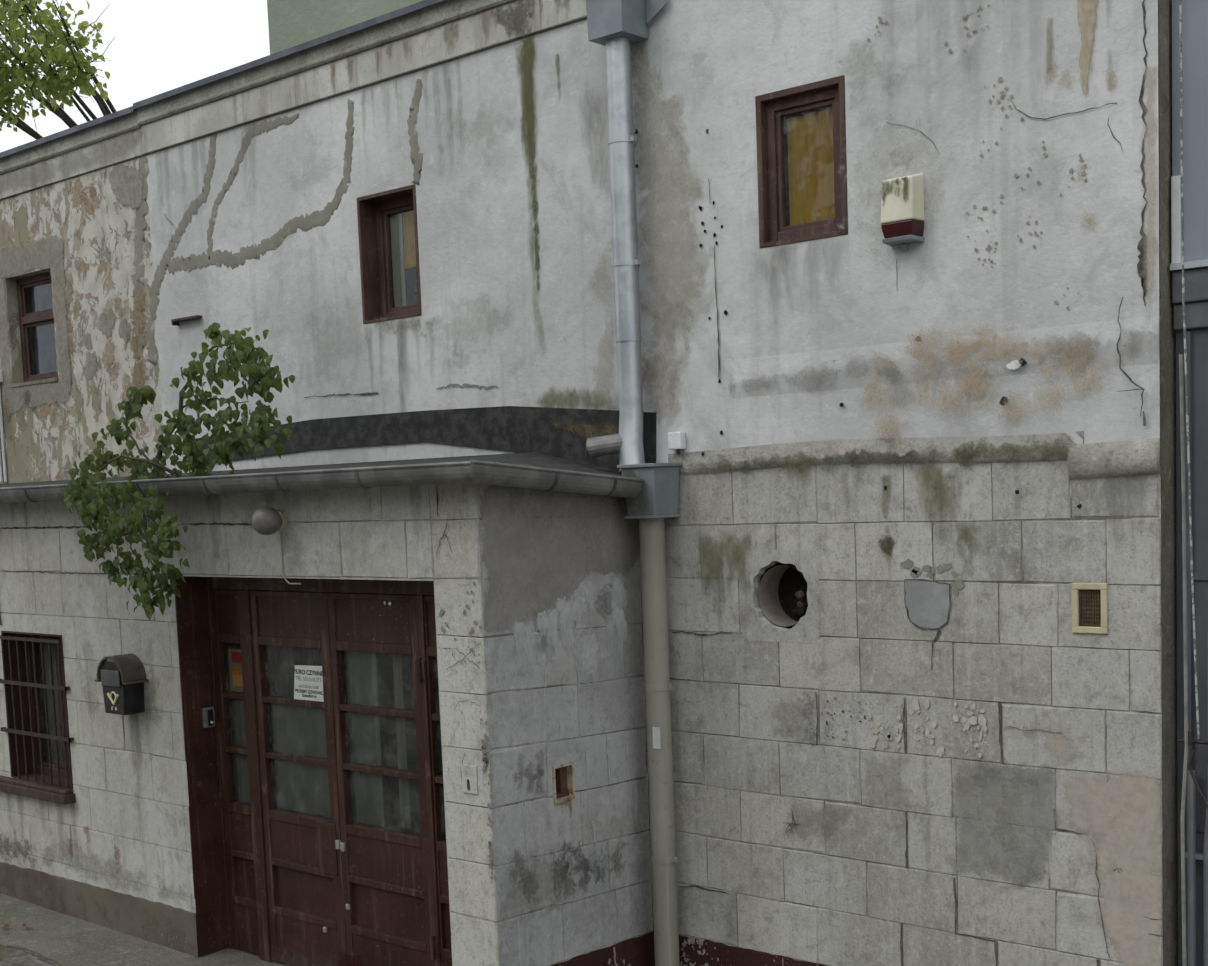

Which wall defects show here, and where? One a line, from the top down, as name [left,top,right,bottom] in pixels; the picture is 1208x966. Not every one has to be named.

flaking render [69,176,101,213]
damp [518,39,540,289]
crack [1010,0,1148,426]
flaking render [65,278,149,401]
flaking render [1006,357,1027,370]
peeling [680,936,731,966]